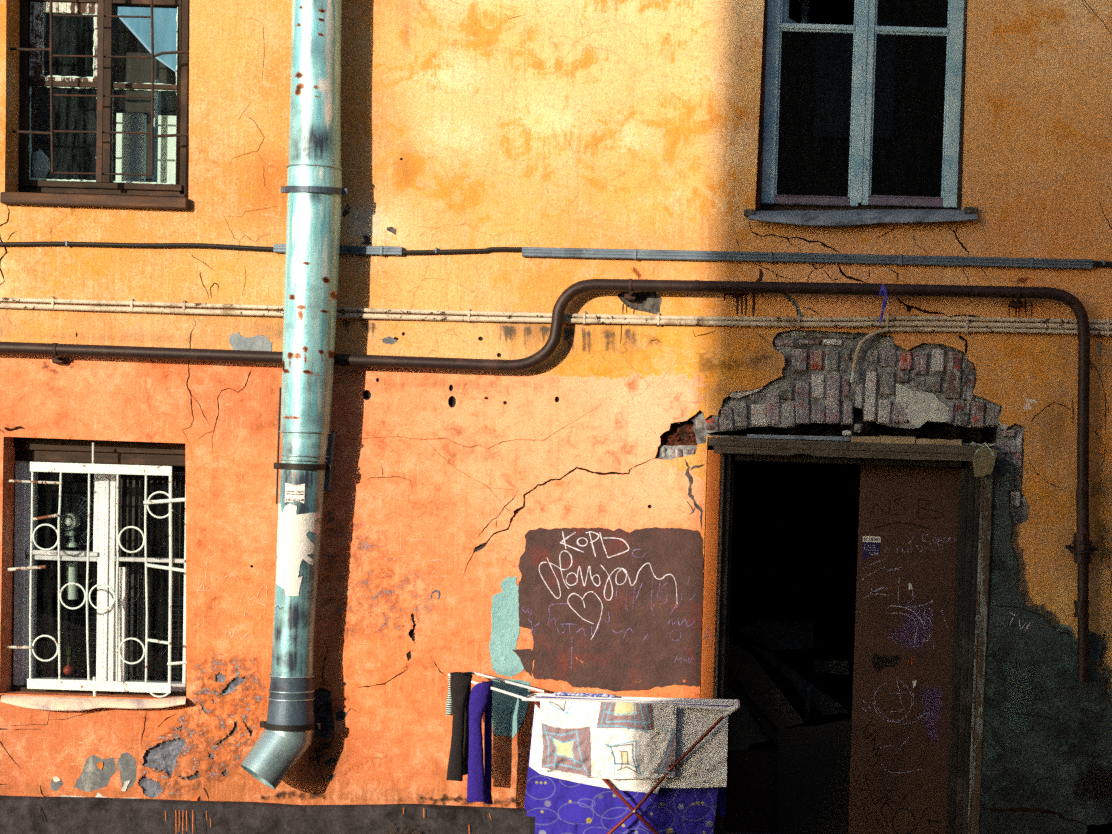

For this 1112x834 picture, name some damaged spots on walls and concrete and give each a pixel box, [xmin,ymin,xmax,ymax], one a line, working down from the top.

crack [0,204,17,285]
crack [183,105,275,447]
spalling [655,294,1030,525]
crack [339,409,655,577]
crack [685,459,704,530]
peeling [50,725,199,799]
spalling [1087,822,1112,834]